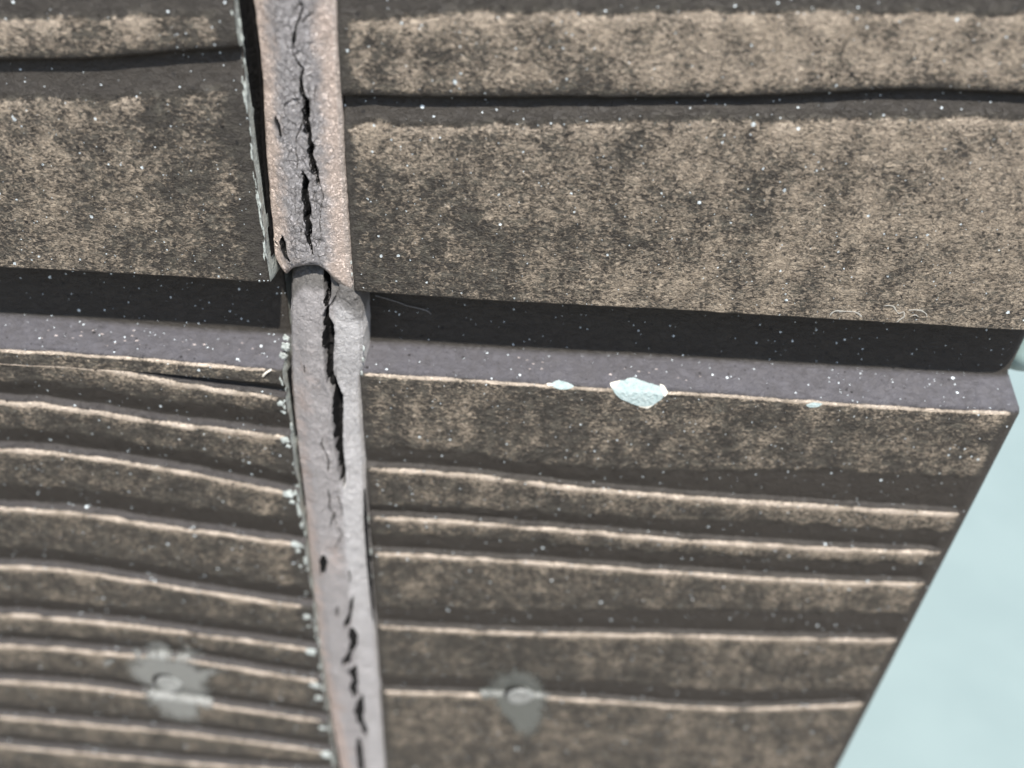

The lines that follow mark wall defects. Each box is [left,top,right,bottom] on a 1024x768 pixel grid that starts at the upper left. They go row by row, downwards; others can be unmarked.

crack [274,2,368,768]
peeling [609,368,668,409]